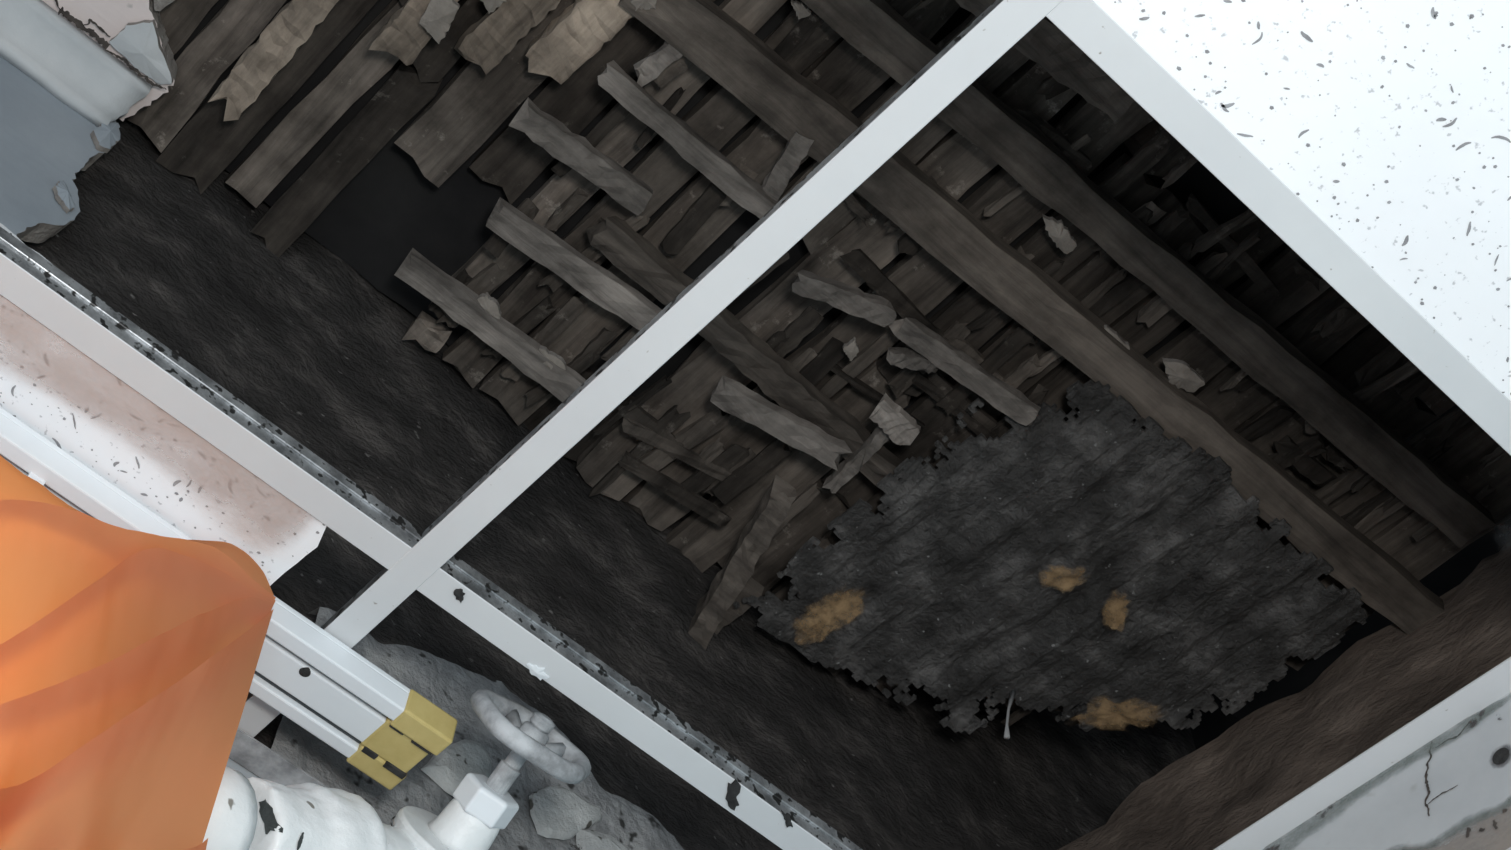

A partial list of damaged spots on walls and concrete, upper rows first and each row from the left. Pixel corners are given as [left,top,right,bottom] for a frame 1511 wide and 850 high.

crack [55,0,166,89]
peeling [419,0,460,44]
peeling [0,0,178,243]
peeling [1043,214,1077,254]
peeling [477,292,502,320]
peeling [843,337,859,361]
peeling [1163,358,1205,392]
spalling [271,633,684,850]
leakage [1264,700,1511,850]
crack [1425,724,1468,816]
peeling [259,799,304,850]
crack [1466,808,1507,838]